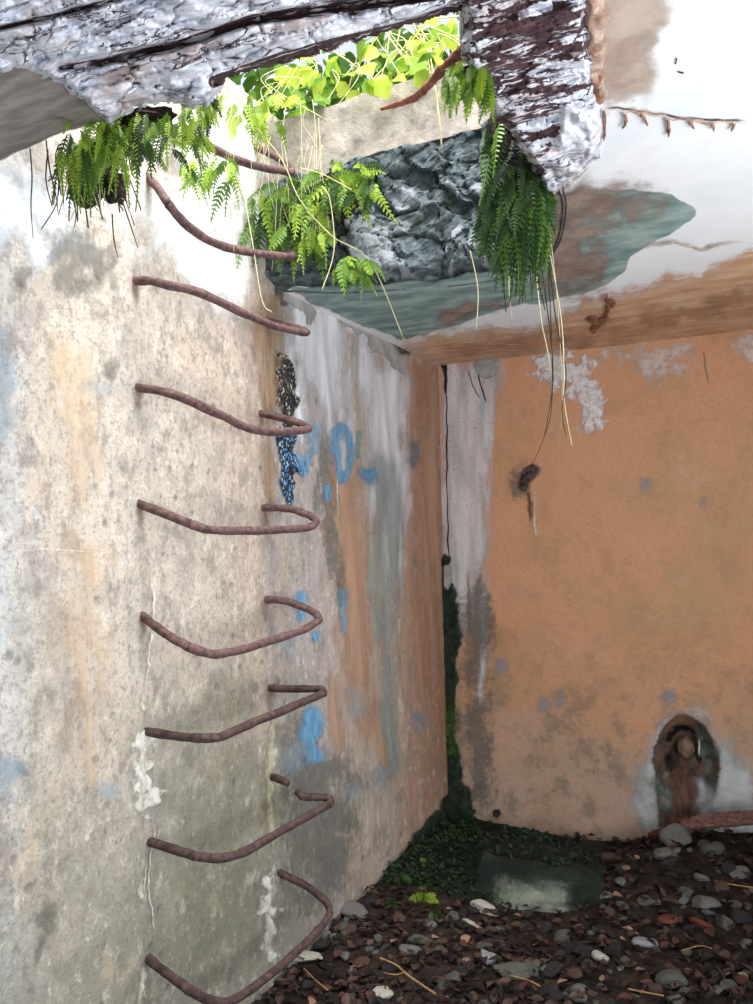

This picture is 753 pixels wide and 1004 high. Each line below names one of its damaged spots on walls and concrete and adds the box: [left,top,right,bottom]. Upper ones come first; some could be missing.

peeling [275,288,317,325]
spalling [587,294,616,334]
corrosion [254,296,282,504]
damp [288,183,753,778]
crack [146,583,156,677]
damp [131,730,167,819]
damp [633,711,713,832]
damp [714,746,753,813]
damp [715,825,753,833]
crack [144,829,156,929]
damp [258,876,284,964]